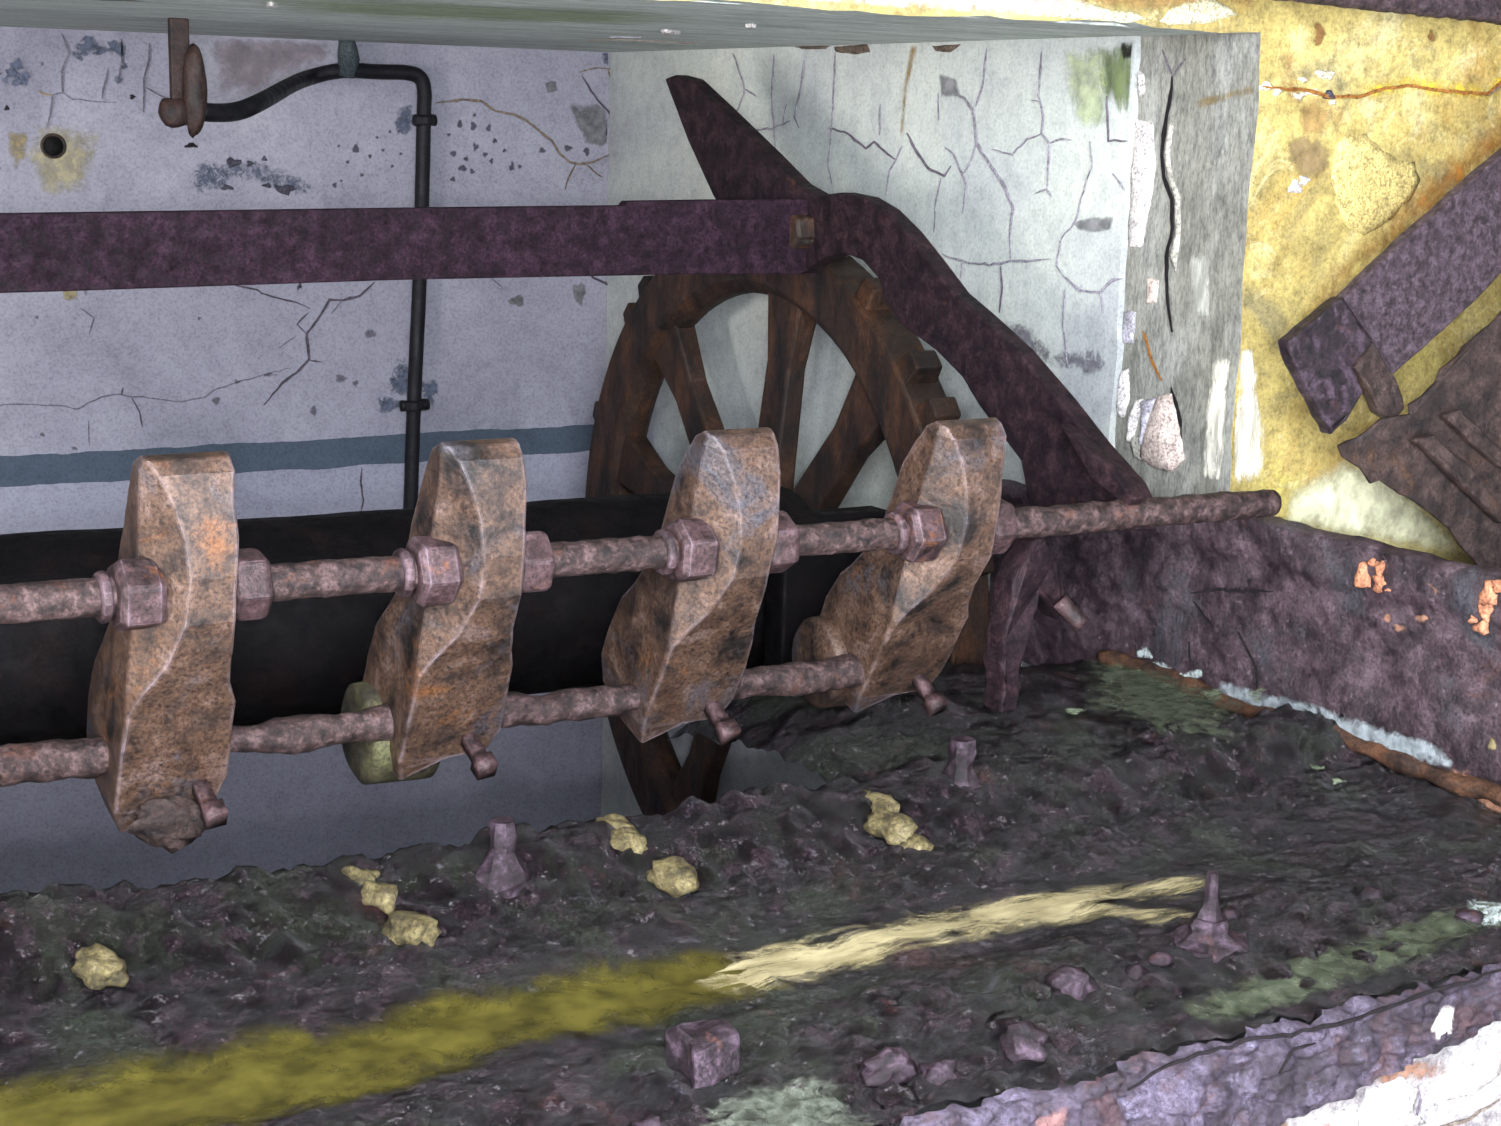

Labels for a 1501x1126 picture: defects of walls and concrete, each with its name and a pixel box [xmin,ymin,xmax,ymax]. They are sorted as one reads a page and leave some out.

water stain [1121,43,1132,59]
crack [38,34,166,129]
water stain [1069,56,1105,123]
peeling [1137,70,1146,97]
crack [1262,81,1501,99]
crack [732,49,1185,369]
peeling [1076,118,1155,247]
crack [0,282,375,446]
corrosion [1354,558,1391,593]
corrosion [1468,580,1501,635]
corrosion [1431,1008,1453,1039]
peeling [1308,1076,1426,1126]